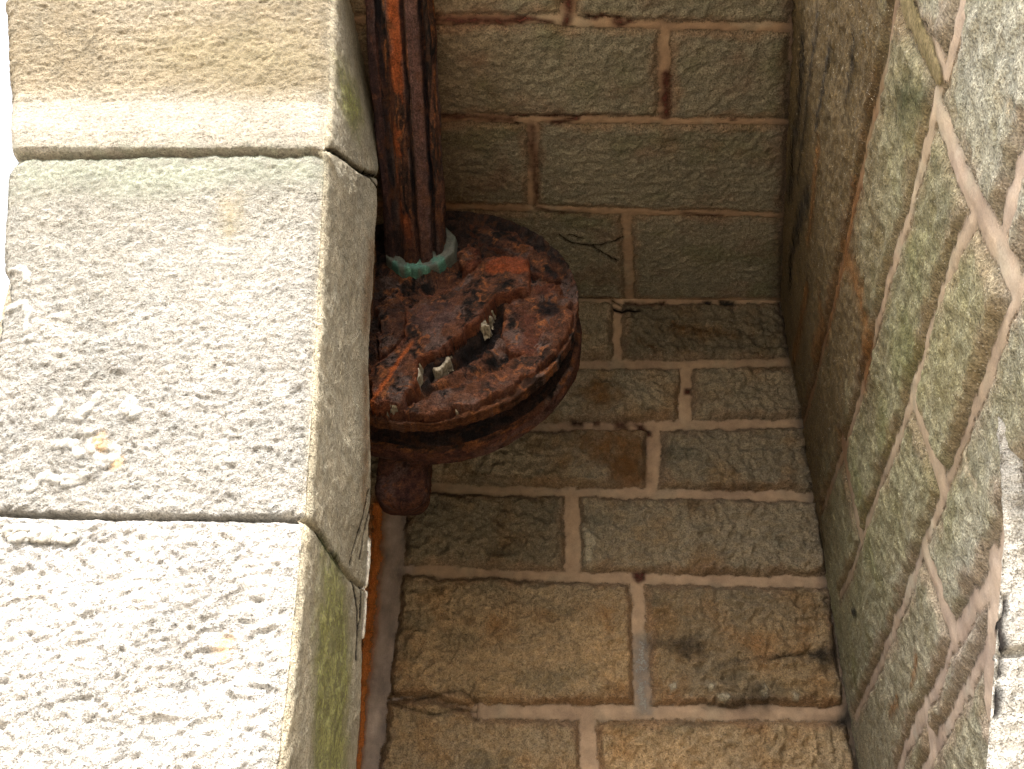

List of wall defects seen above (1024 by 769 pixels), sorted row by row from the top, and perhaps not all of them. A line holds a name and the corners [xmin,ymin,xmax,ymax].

crack [559,234,621,261]
crack [349,490,369,660]
corrosion [356,501,383,769]